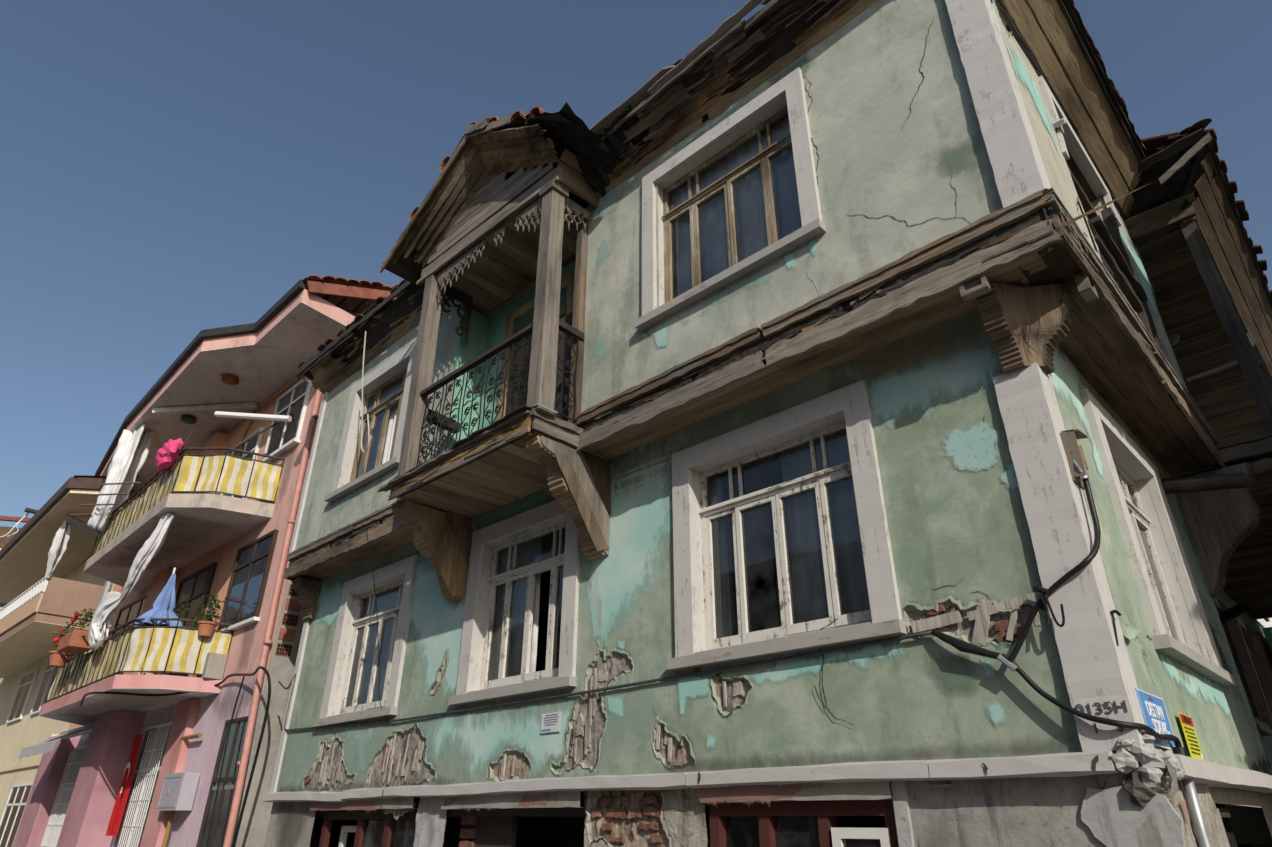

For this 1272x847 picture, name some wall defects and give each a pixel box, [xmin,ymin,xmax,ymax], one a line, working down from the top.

crack [902,21,933,127]
peeling [990,0,1057,148]
crack [804,75,819,186]
crack [849,176,971,226]
peeling [942,422,1019,491]
spalling [276,644,292,656]
peeling [300,439,673,820]
flaking render [678,592,1047,720]
flaking render [652,715,715,771]
peeling [986,702,1005,725]
flaking render [584,790,672,847]
peeling [688,783,806,805]